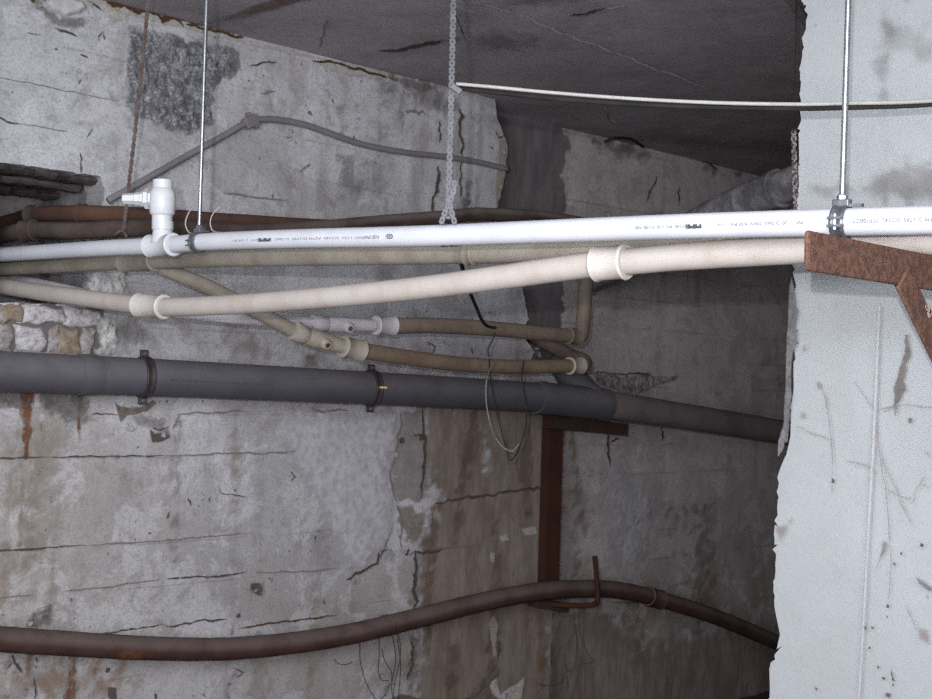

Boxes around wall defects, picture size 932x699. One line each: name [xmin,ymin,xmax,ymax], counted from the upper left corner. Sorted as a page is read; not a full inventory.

leakage [88,0,479,105]
crack [311,0,466,81]
flaking render [0,301,104,355]
spalling [591,371,677,395]
corrosion [20,392,35,459]
crack [0,533,242,551]
crack [0,450,296,481]
crack [67,531,473,609]
peeling [389,411,427,546]
leakage [409,407,542,607]
crack [415,408,540,504]
crack [105,615,336,634]